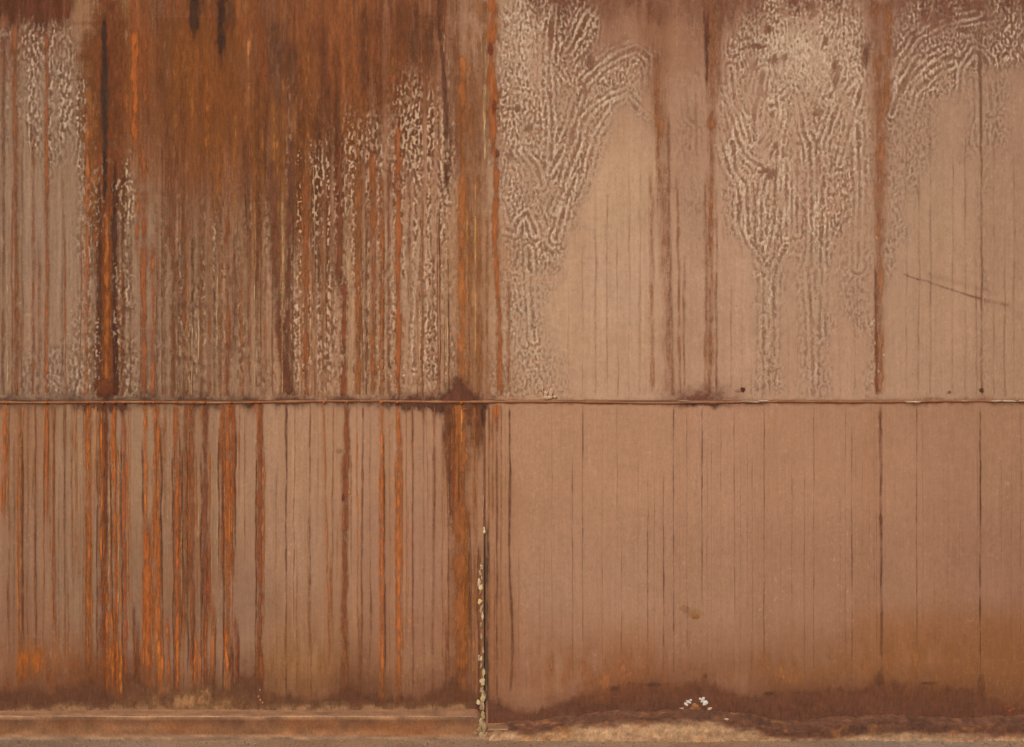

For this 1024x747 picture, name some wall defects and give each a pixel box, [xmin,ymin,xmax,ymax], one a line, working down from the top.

rust [0,0,510,703]
rust [866,0,892,392]
damp [0,526,1024,723]